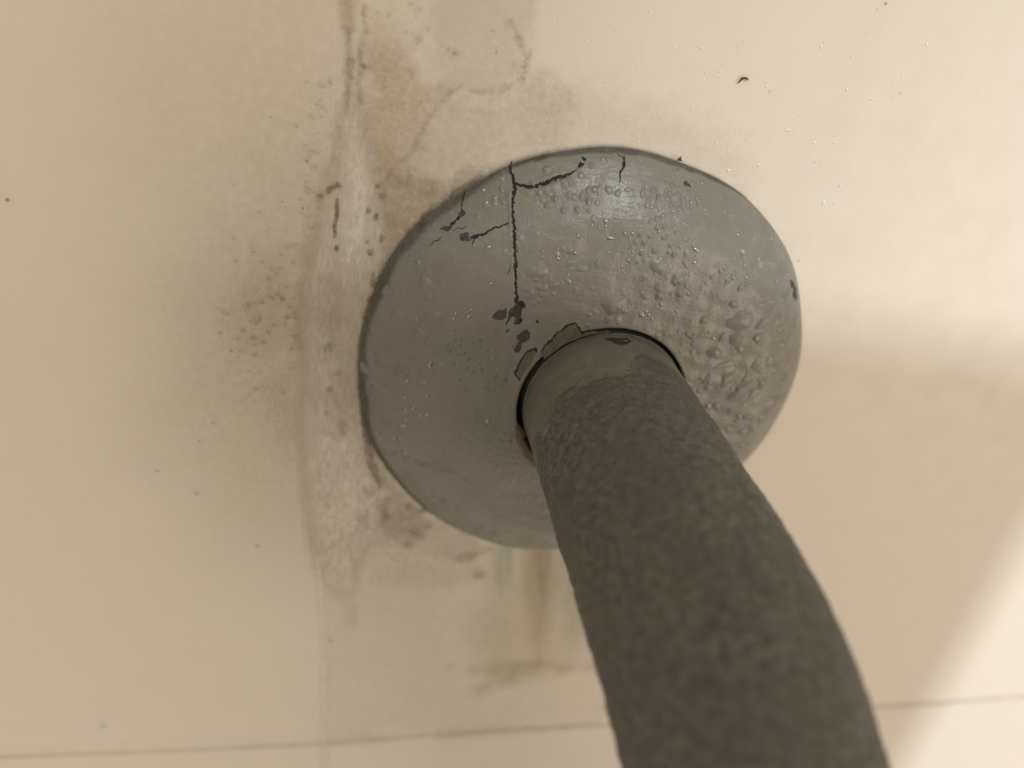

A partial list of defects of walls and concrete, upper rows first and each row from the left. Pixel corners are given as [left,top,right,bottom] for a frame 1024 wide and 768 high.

crack [617,153,626,186]
crack [430,156,586,303]
peeling [493,300,632,381]